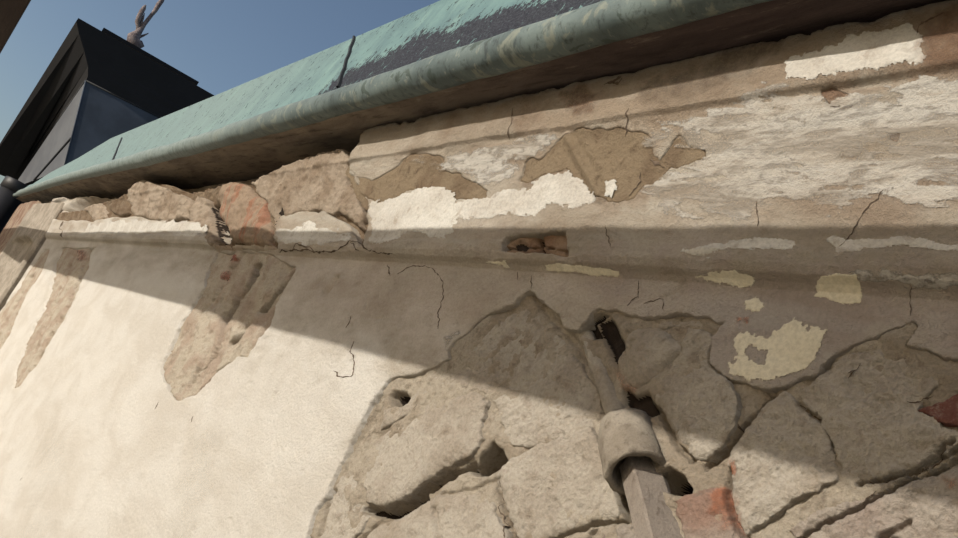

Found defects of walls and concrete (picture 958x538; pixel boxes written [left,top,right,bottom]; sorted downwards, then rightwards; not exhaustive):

spalling [0,248,94,388]
crack [333,316,355,378]
crack [279,240,444,326]
peeling [57,23,958,401]
spalling [310,296,958,538]
crack [840,190,883,246]